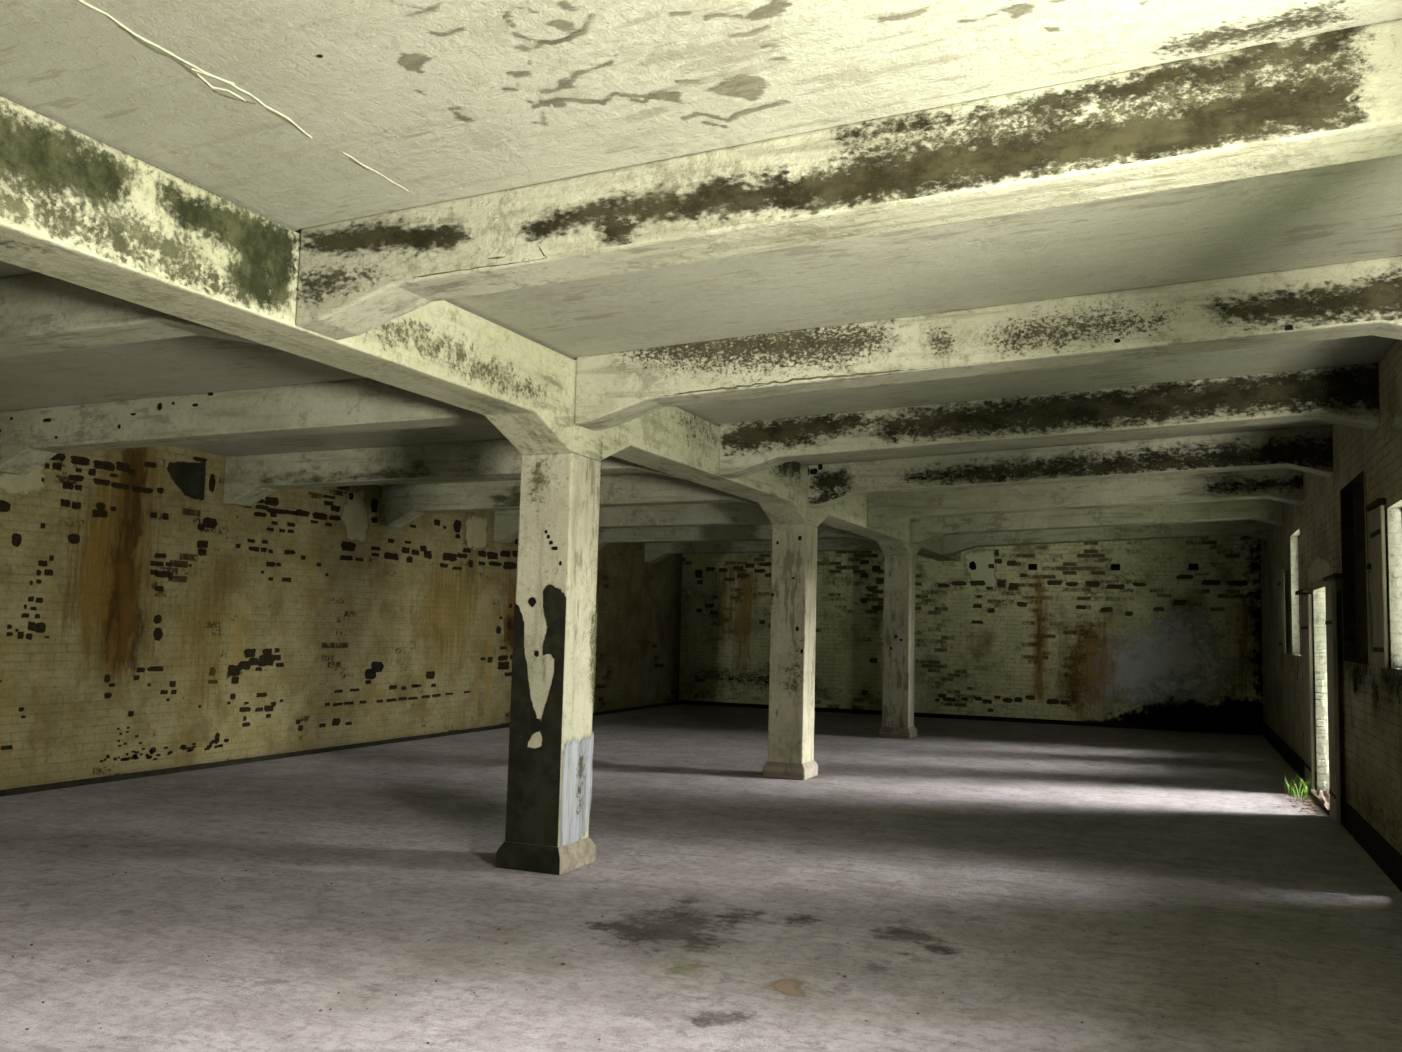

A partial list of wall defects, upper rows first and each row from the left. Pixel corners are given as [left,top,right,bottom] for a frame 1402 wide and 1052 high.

crack [78,0,312,138]
leakage [0,103,474,311]
crack [343,152,409,192]
peeling [503,0,792,128]
leakage [520,0,1372,246]
leakage [1208,264,1402,331]
flaking render [41,407,216,518]
leakage [676,363,1379,504]
rust [83,447,154,678]
rust [504,576,516,652]
flaking render [208,648,284,727]
spalling [480,584,566,847]